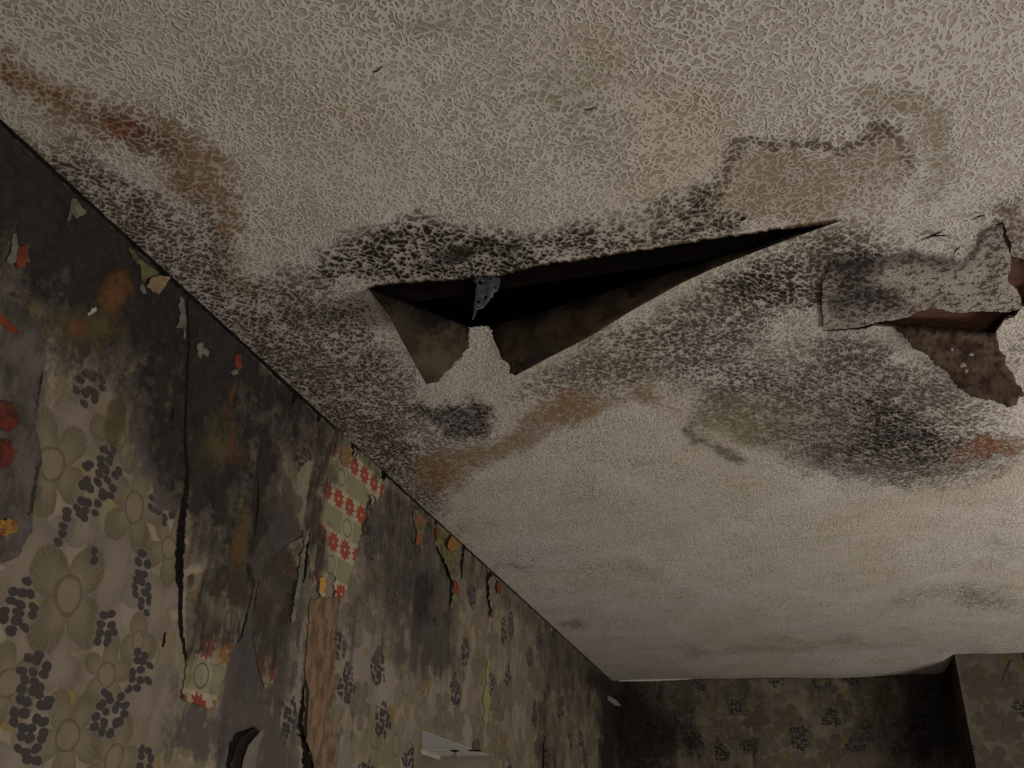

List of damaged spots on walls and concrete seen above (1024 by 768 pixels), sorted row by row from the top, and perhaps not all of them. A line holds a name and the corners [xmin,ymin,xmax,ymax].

crack [0,119,609,679]
leakage [0,121,899,583]
leakage [522,229,1016,489]
peeling [822,229,1022,329]
leakage [988,198,1024,264]
peeling [182,422,384,768]